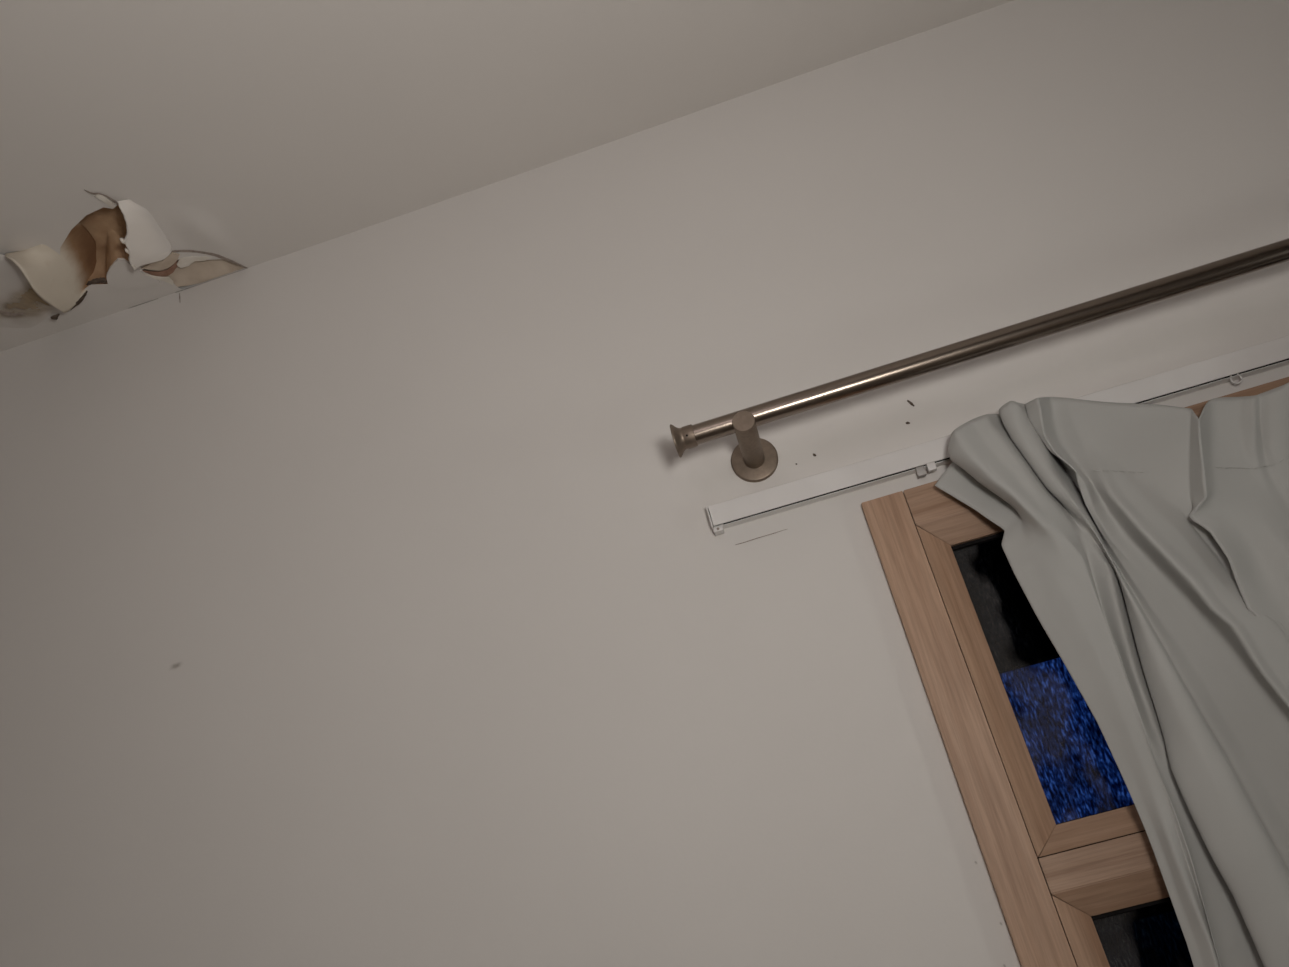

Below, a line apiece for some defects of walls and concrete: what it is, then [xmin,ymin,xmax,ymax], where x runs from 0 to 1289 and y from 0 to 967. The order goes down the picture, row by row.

spalling [79,205,244,289]